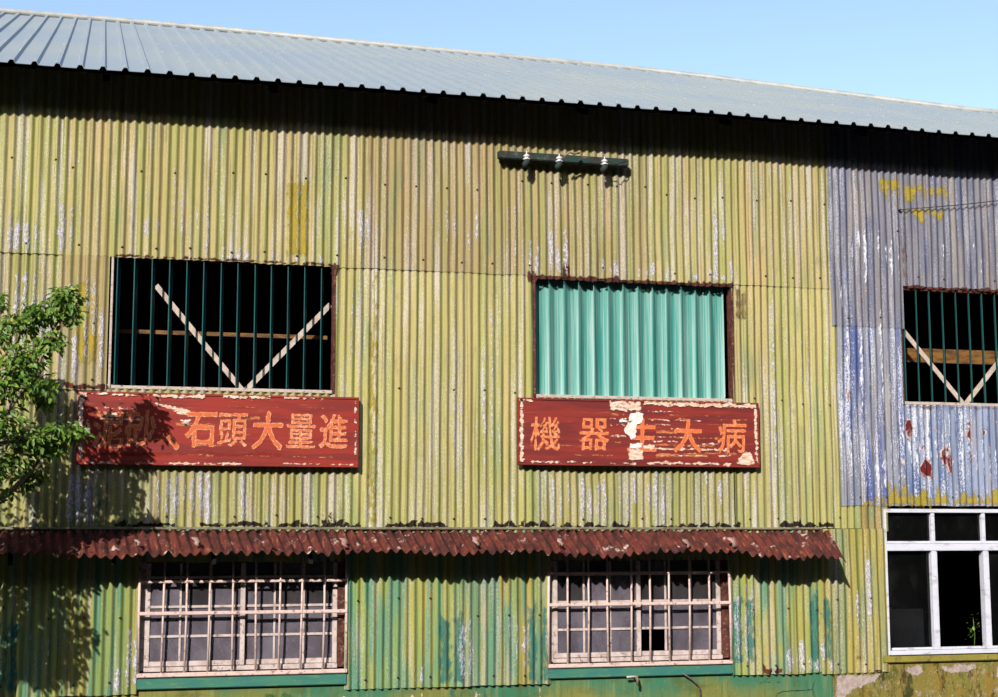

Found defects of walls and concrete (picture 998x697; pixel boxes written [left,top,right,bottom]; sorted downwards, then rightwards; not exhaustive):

rust [945,445,954,474]
rust [0,512,846,562]
spalling [907,665,923,676]
spalling [942,663,976,673]